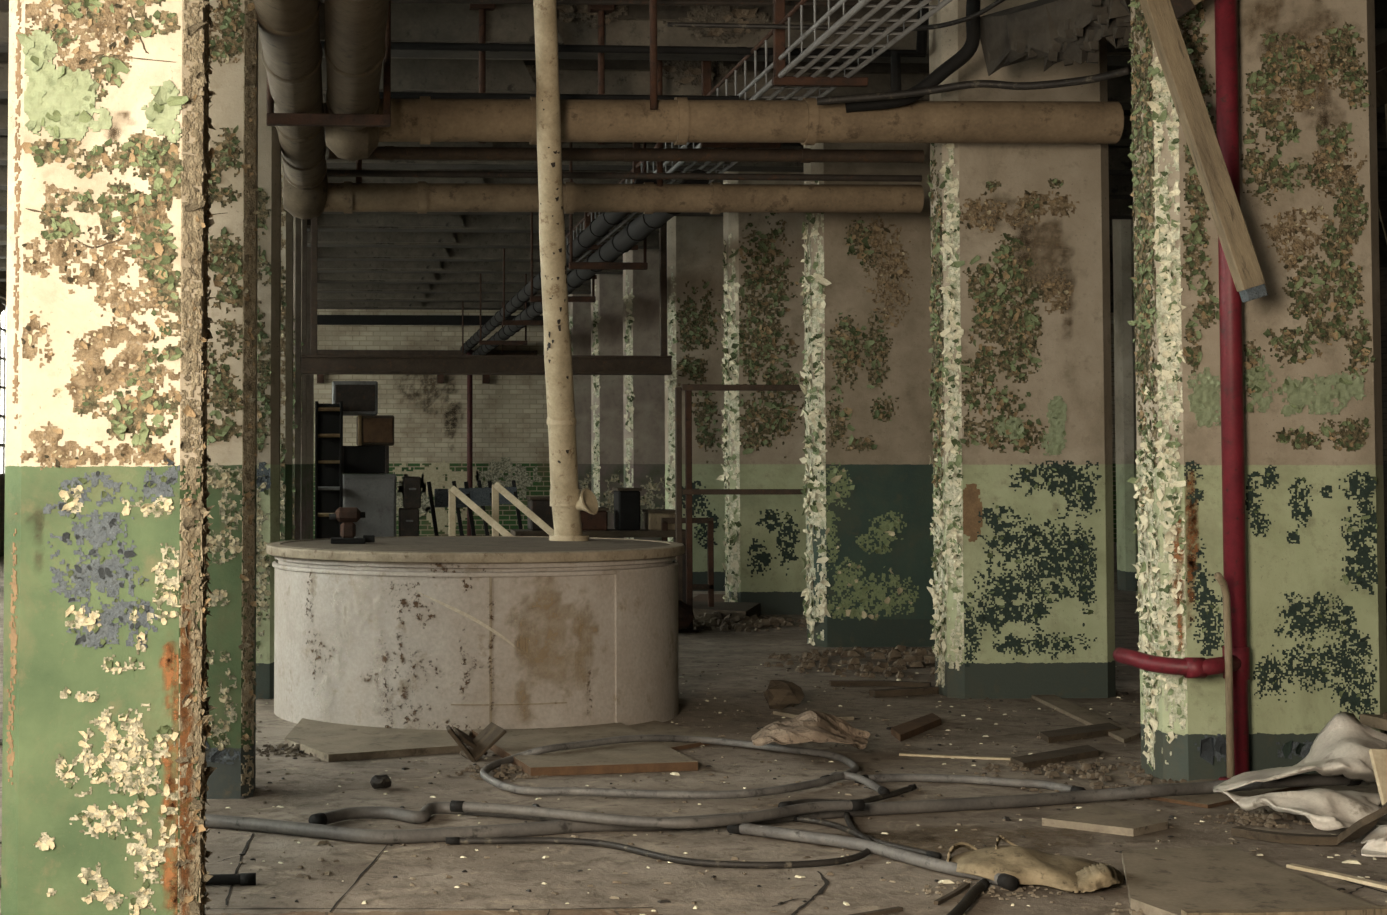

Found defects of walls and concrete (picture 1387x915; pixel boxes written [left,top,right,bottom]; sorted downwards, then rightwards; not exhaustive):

peeling [6,512,18,785]
peeling [12,0,304,915]
rust [160,592,196,915]
peeling [543,248,573,363]
peeling [591,143,1102,688]
spalling [980,0,1226,771]
peeling [1276,740,1313,760]
peeling [1240,22,1375,452]
peeling [1245,465,1378,719]